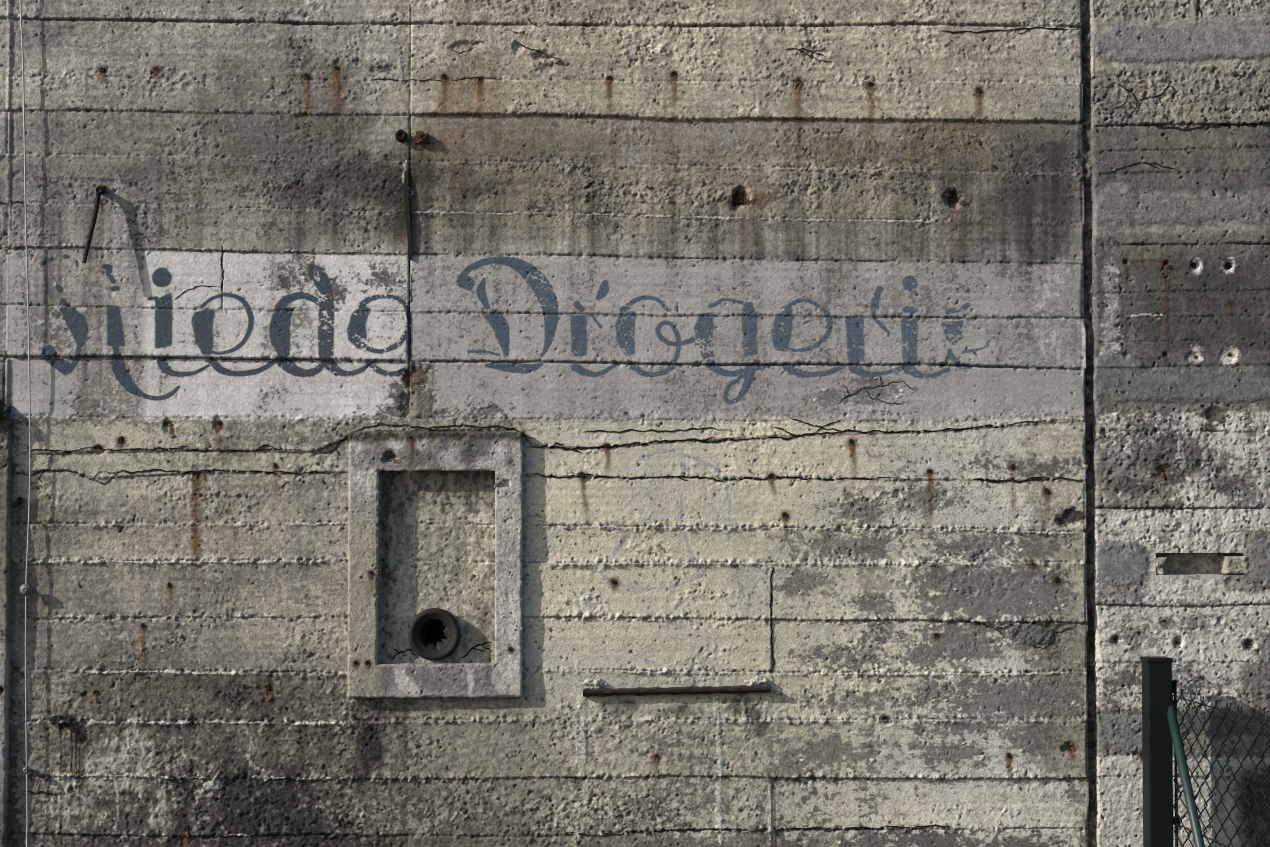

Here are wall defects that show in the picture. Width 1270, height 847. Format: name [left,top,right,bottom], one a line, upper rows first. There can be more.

damp [285,156,466,222]
damp [577,209,766,221]
crack [16,376,1080,485]
corrosion [191,472,205,555]
damp [36,668,383,847]